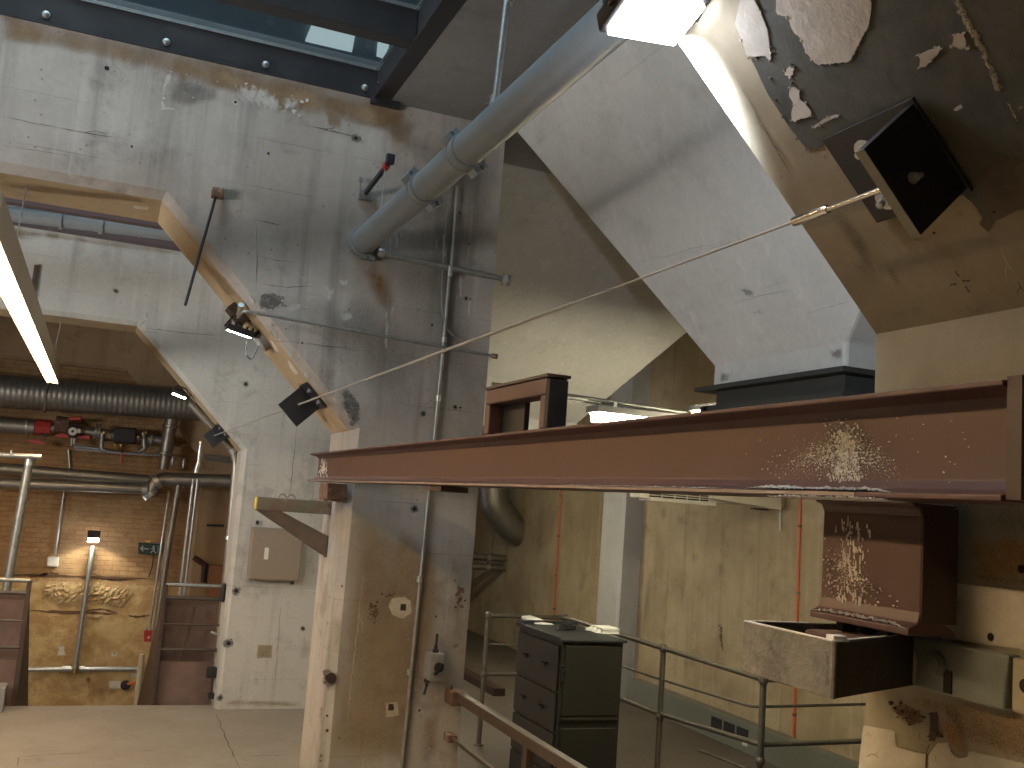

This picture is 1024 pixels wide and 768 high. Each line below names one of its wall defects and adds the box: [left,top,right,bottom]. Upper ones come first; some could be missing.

peeling [735,0,1024,231]